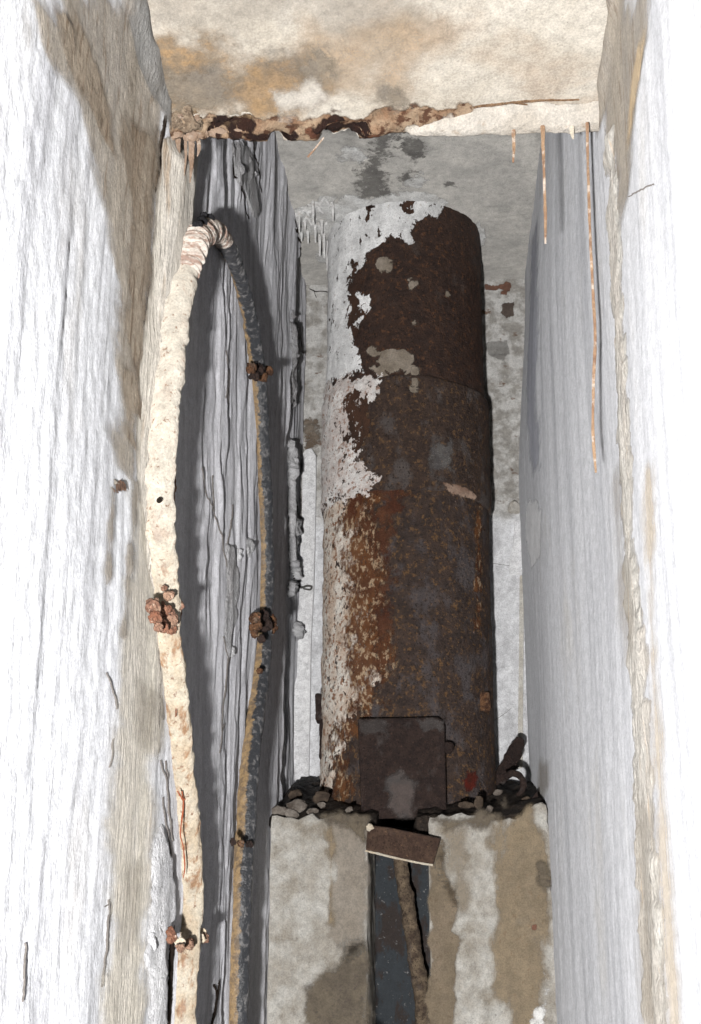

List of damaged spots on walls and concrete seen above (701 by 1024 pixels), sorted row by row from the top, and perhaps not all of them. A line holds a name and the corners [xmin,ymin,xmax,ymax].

damp [274,80,327,113]
crack [438,99,579,111]
spalling [170,103,474,218]
corrosion [399,201,415,214]
corrosion [343,259,368,344]
corrosion [484,282,511,295]
corrosion [340,389,372,453]
damp [294,0,677,1024]
corrosion [473,505,483,629]
corrosion [327,490,409,802]
corrosion [385,770,417,818]